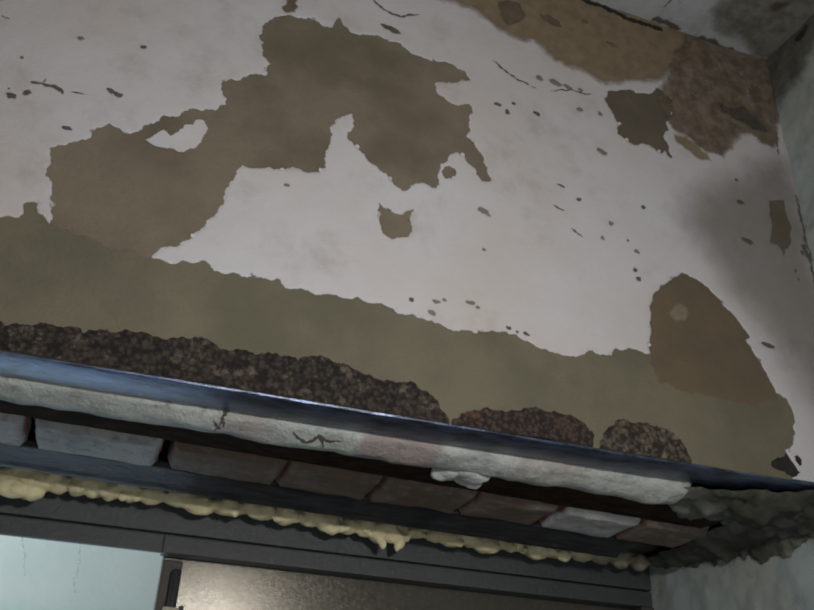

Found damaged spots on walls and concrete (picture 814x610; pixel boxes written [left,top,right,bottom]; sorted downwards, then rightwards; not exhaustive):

peeling [0,0,802,480]
crack [213,410,229,431]
crack [293,432,341,448]